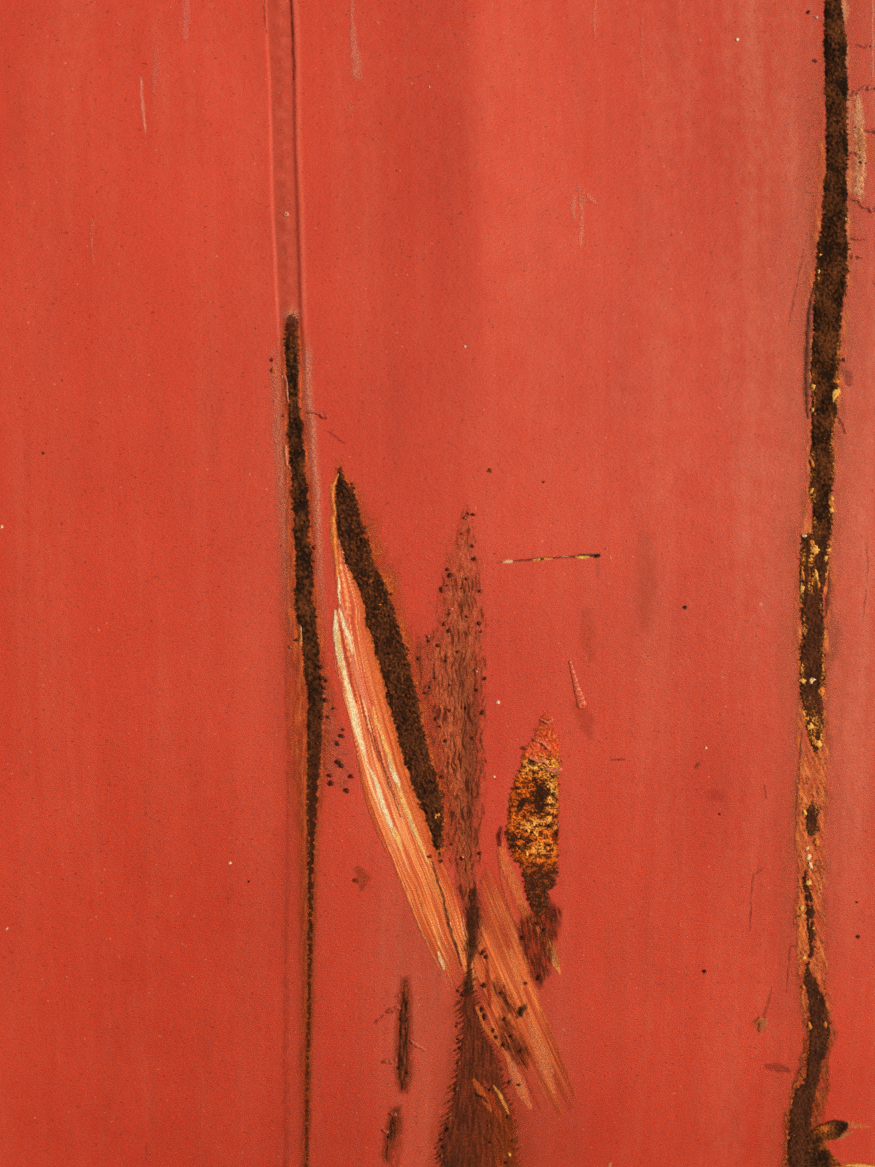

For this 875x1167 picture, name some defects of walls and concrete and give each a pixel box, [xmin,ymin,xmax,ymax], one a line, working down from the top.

corrosion [271,311,354,1167]
spalling [330,468,447,863]
corrosion [382,1108,399,1160]
corrosion [377,979,425,1091]
corrosion [416,511,528,1167]
corrosion [498,712,562,986]
corrosion [783,0,875,1167]